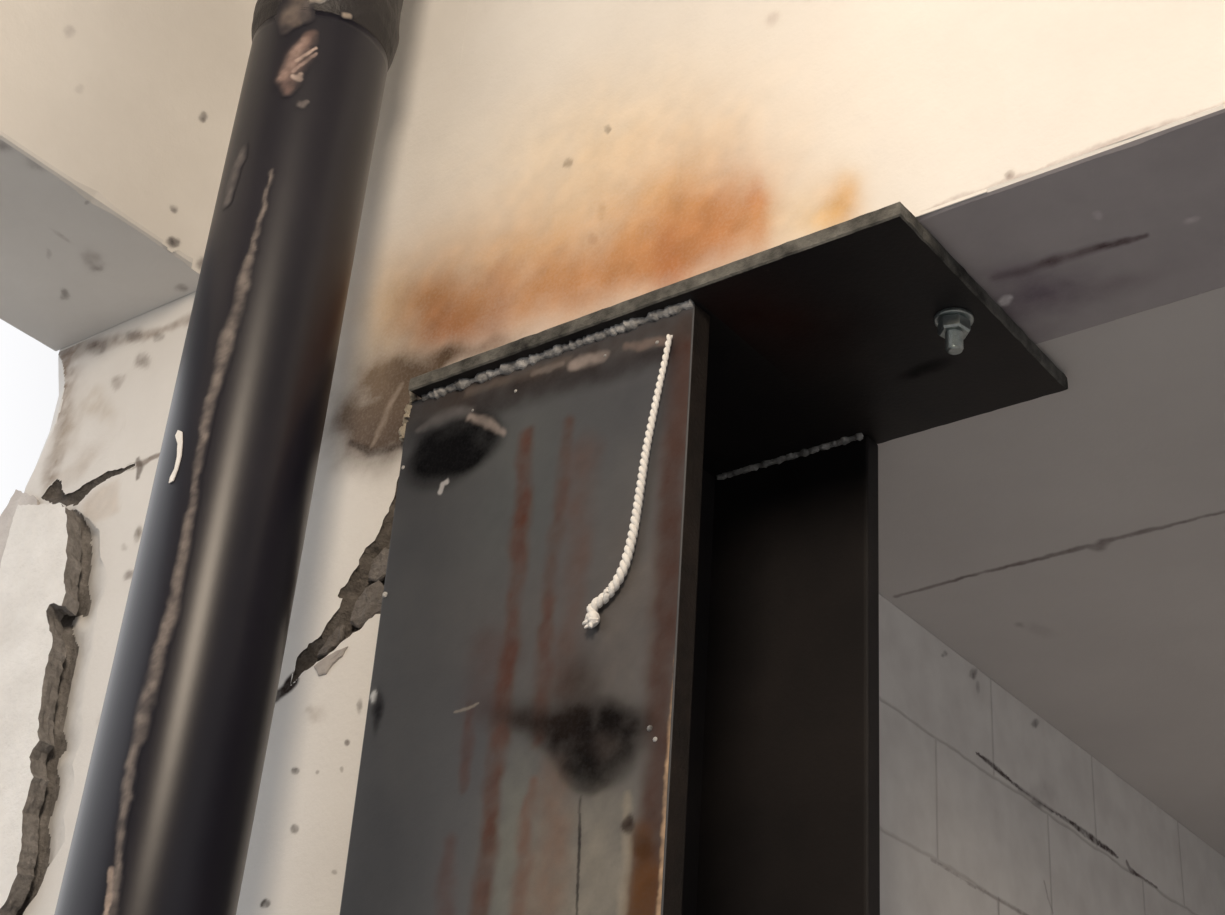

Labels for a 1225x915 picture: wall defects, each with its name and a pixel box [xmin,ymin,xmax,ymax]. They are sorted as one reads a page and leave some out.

rust [344,0,1006,336]
flaking render [0,490,82,915]
crack [16,451,160,915]
crack [275,485,398,705]
rust [465,738,514,915]
rust [501,422,539,644]
rust [551,423,611,632]
rust [616,744,670,915]
rust [636,344,691,711]
crack [975,751,1020,789]
crack [891,509,1225,599]
crack [1052,810,1158,889]